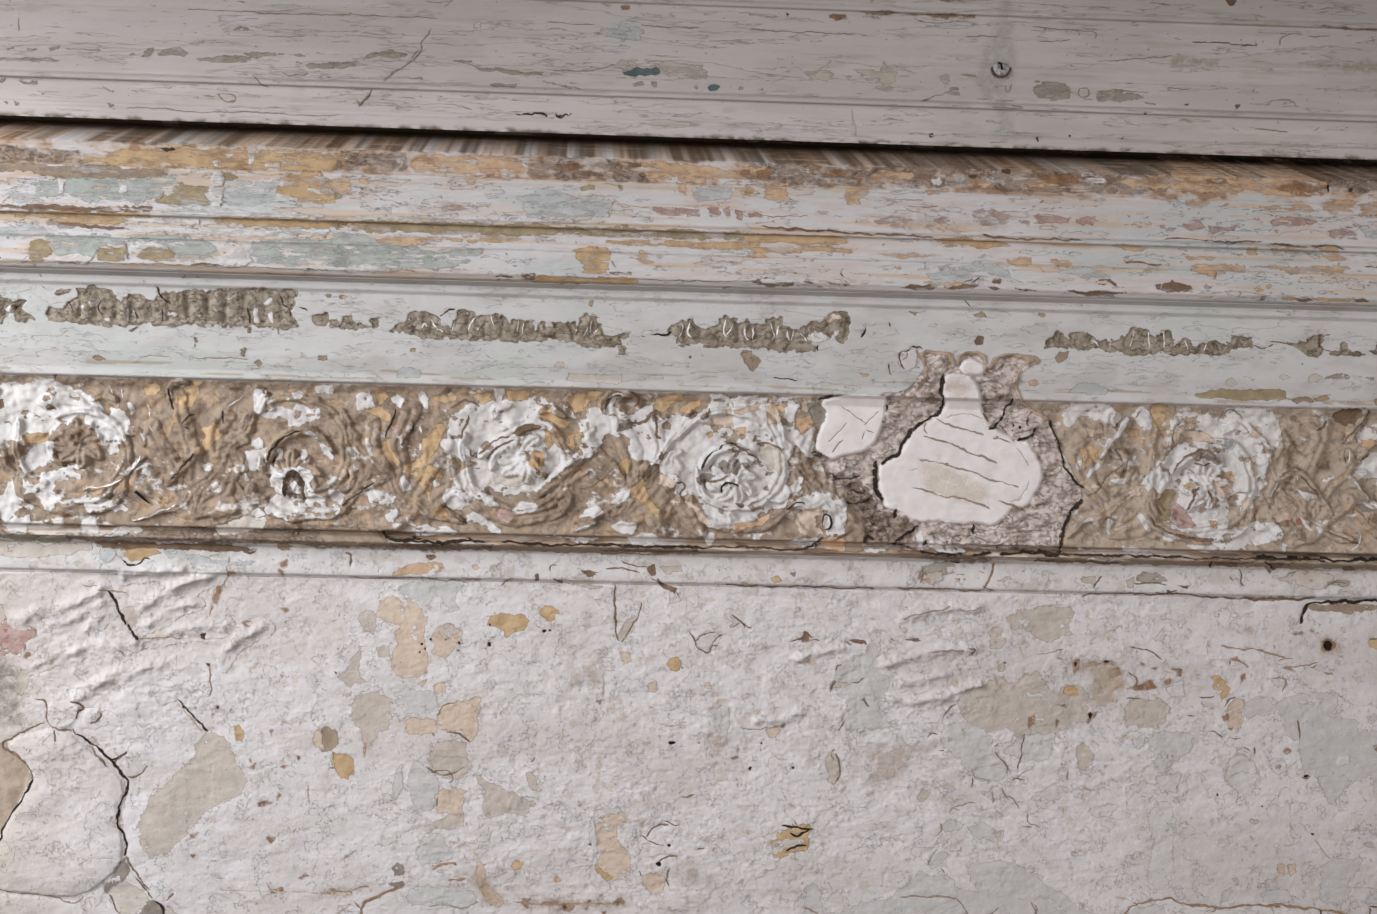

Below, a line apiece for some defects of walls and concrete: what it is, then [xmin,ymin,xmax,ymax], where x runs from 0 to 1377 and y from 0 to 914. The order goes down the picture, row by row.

peeling [0,145,1377,366]
peeling [667,311,866,380]
crack [863,358,1377,692]
peeling [988,334,1377,649]
peeling [0,362,915,914]
crack [790,631,921,644]
crack [164,699,208,732]
peeling [927,670,1089,787]
crack [0,723,149,904]
peeling [802,860,1098,914]
crack [901,765,1118,914]
crack [1114,897,1377,914]